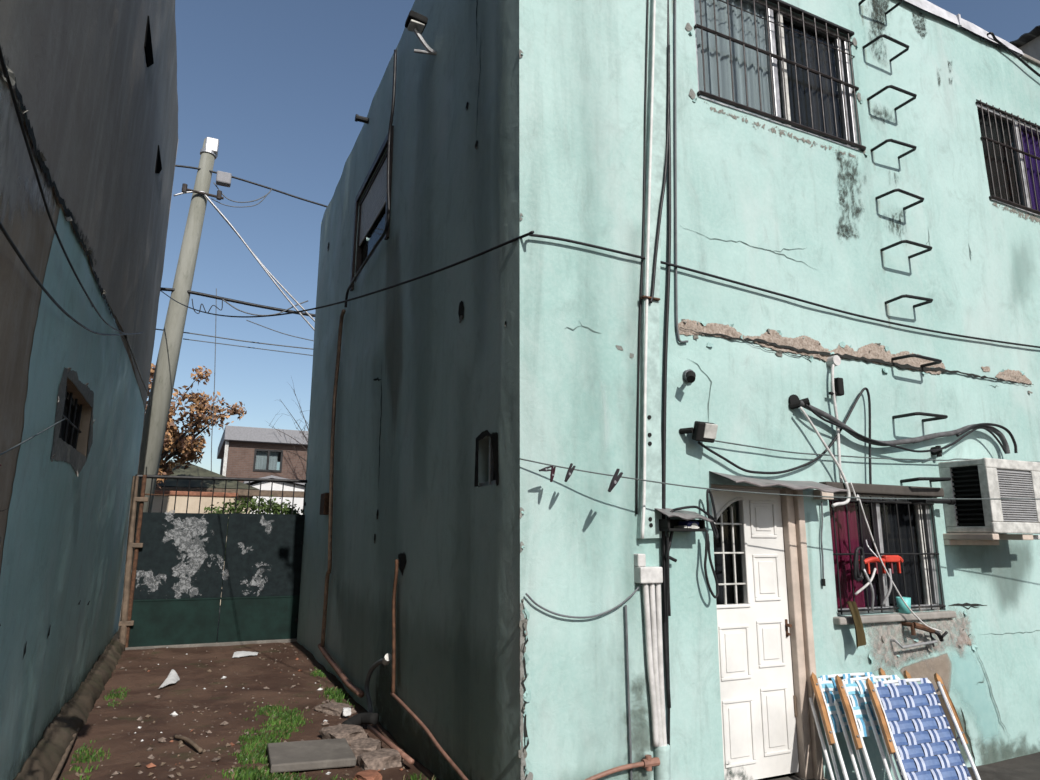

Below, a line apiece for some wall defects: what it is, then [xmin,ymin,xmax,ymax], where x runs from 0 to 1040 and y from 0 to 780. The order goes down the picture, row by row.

damp [869,0,889,60]
peeling [0,75,52,222]
damp [837,152,862,238]
crack [681,226,814,269]
spalling [678,319,1034,394]
spalling [518,599,533,780]
crack [961,709,976,765]